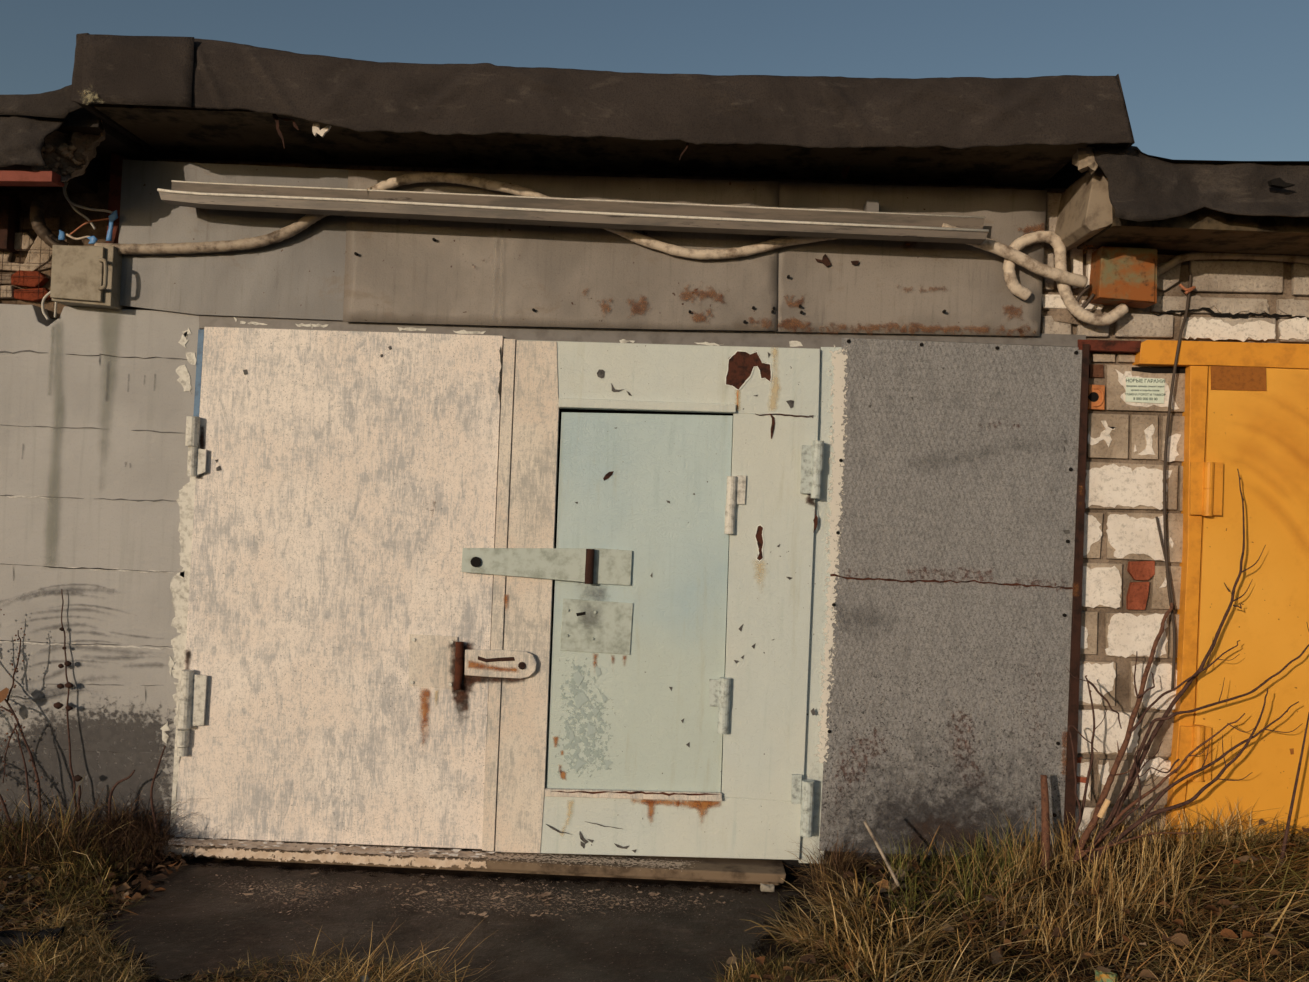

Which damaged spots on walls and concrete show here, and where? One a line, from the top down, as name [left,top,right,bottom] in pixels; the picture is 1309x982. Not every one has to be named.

spalling [31,120,106,183]
corrosion [681,288,724,322]
corrosion [826,306,1030,336]
peeling [1115,369,1179,410]
peeling [1063,421,1181,840]
corrosion [451,642,525,712]
corrosion [421,690,437,729]
damp [0,699,175,839]
corrosion [551,737,719,817]